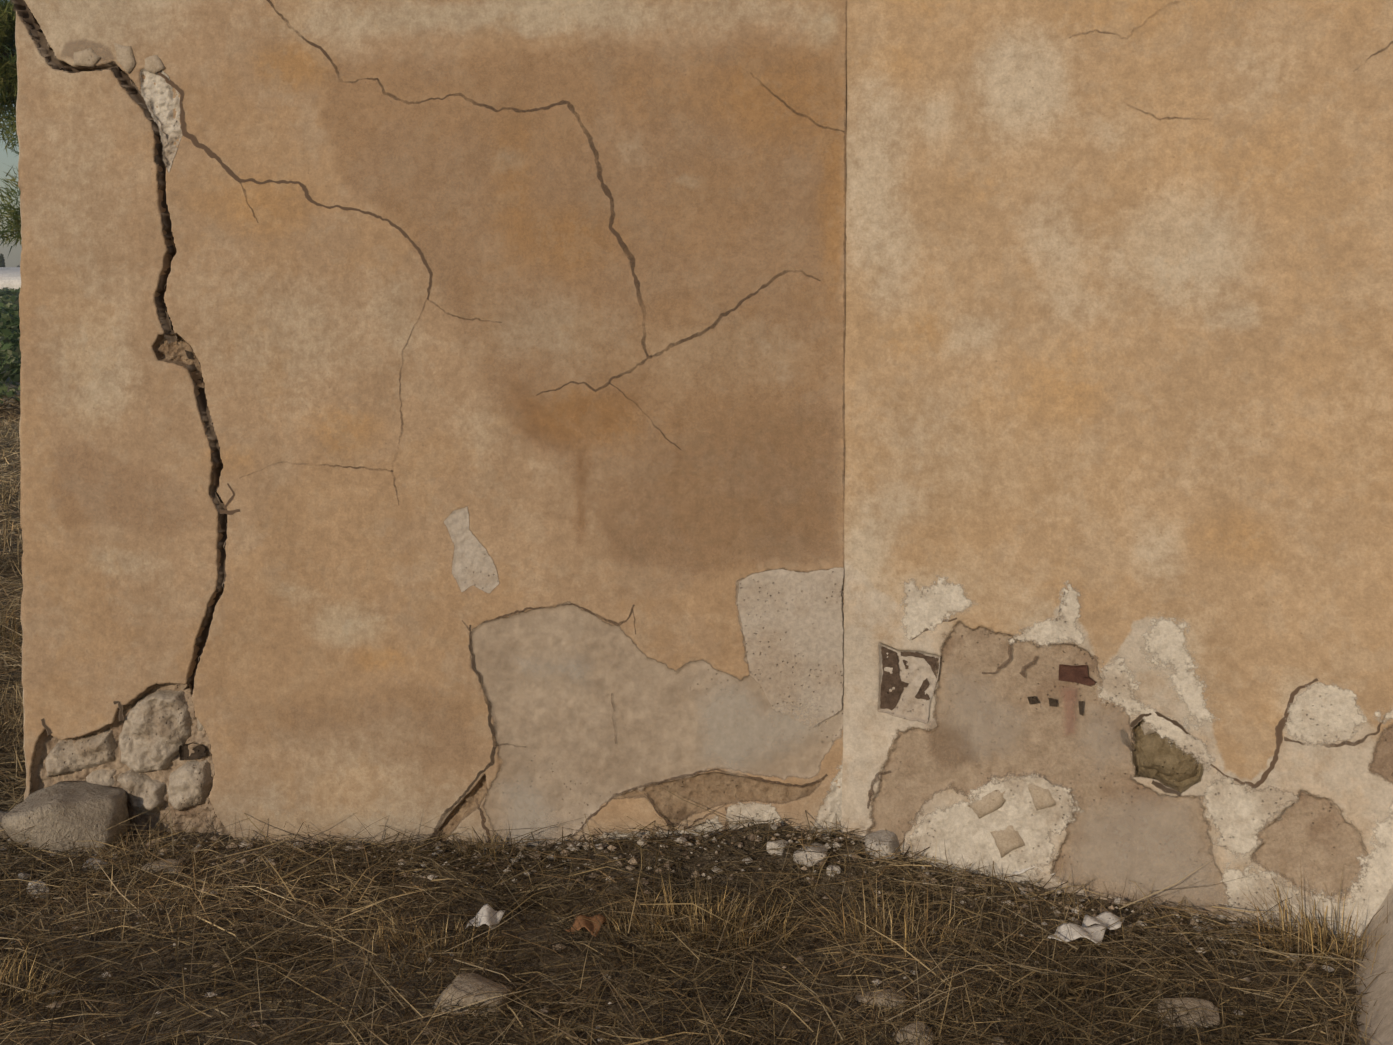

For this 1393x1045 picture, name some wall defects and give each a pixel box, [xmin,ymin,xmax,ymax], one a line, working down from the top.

crack [267,0,640,295]
crack [11,0,433,690]
crack [536,275,779,396]
peeling [444,507,499,593]
spalling [30,683,229,835]
spalling [424,774,488,844]
spalling [597,762,843,841]
spalling [867,575,1393,940]